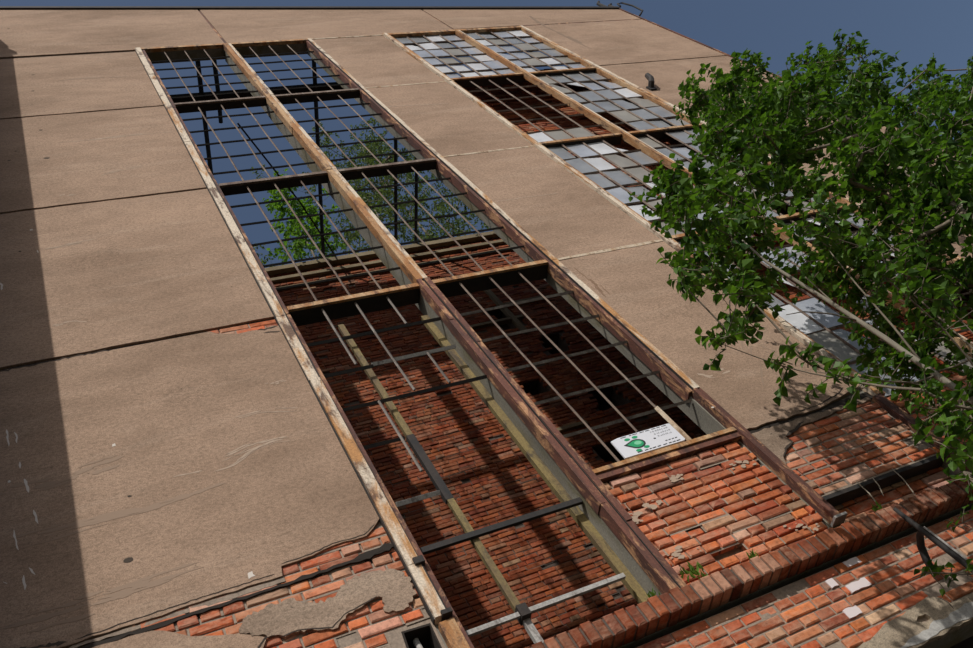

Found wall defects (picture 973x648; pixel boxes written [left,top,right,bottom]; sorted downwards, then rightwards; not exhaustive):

crack [783,387,843,457]
flaking render [784,401,940,497]
crack [75,525,394,648]
flaking render [129,522,446,648]